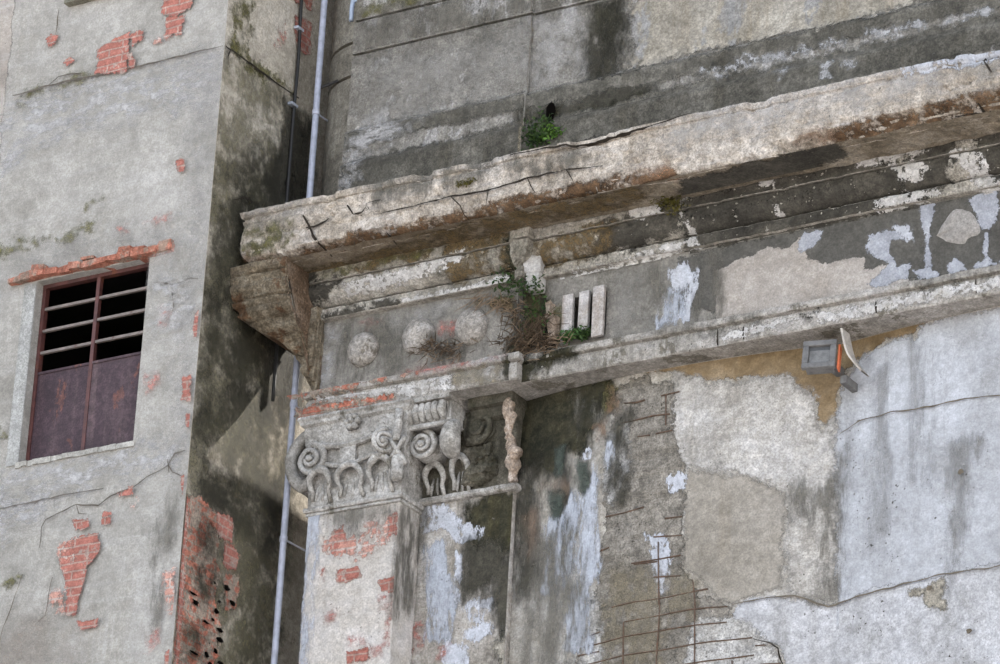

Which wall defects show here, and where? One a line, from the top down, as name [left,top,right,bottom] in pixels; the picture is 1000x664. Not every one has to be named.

flaking render [49,511,112,630]
flaking render [162,475,241,664]
damp [186,0,562,664]
damp [333,379,633,664]
crack [302,113,691,257]
damp [307,132,1000,330]
damp [340,0,1000,205]
peeling [575,307,1000,664]
peeling [715,229,1000,319]
crack [732,565,1000,607]
rust [797,88,1000,147]
crack [840,395,1000,434]